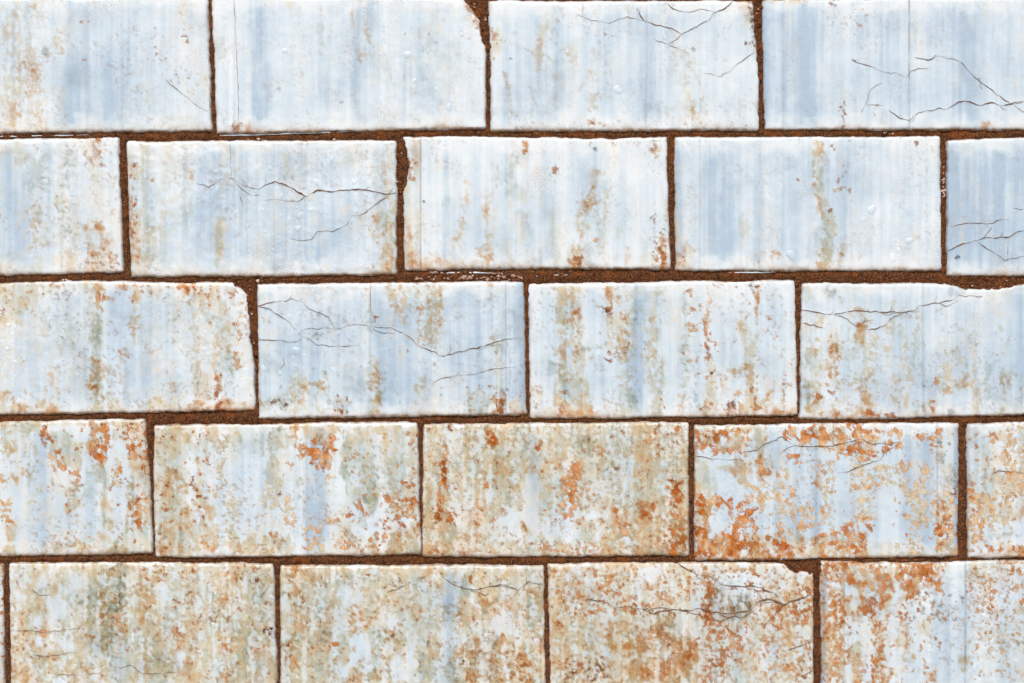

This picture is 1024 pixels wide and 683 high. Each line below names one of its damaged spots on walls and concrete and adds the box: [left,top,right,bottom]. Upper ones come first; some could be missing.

crack [582,1,732,50]
crack [854,56,1024,121]
crack [197,152,397,241]
crack [948,208,1023,261]
rust [93,284,105,313]
crack [258,294,513,382]
rust [686,289,711,359]
crack [801,295,982,330]
crack [697,425,900,473]
rust [0,386,1024,683]
crack [588,563,809,626]